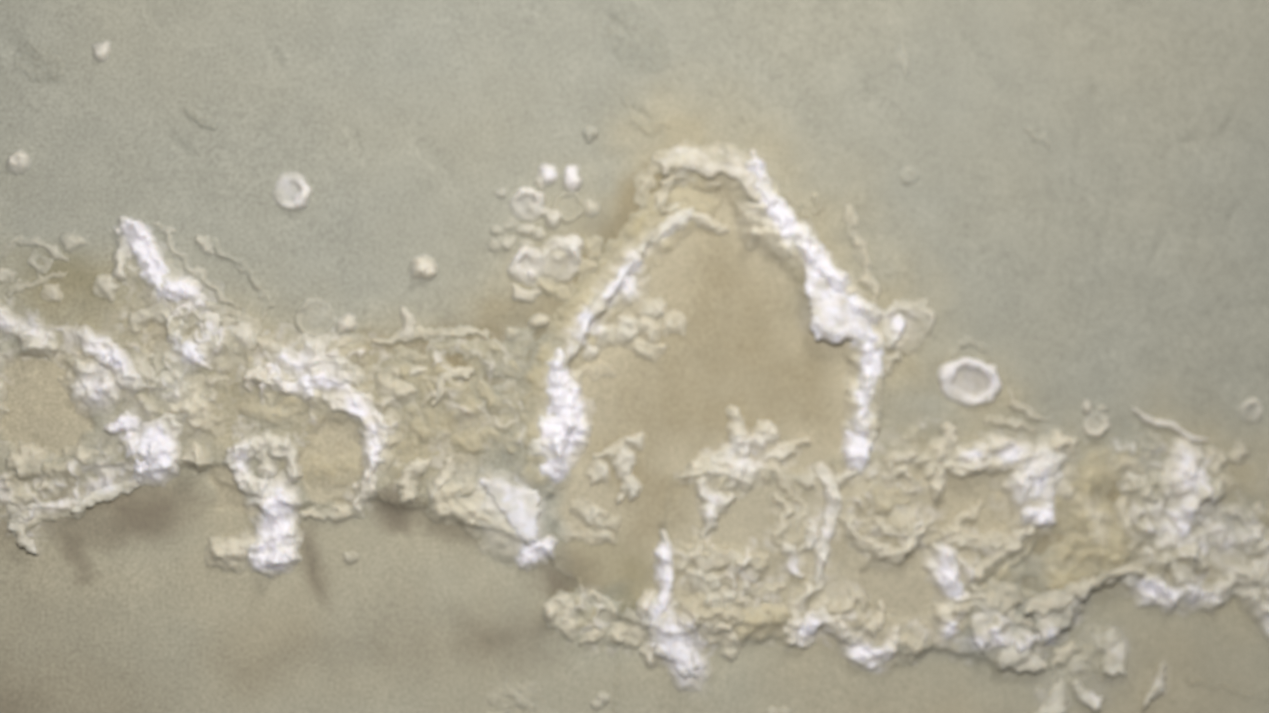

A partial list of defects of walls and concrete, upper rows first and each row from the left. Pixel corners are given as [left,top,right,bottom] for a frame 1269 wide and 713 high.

peeling [0,163,730,572]
peeling [540,574,650,658]
efflorescence [634,529,713,693]
peeling [650,139,1269,713]